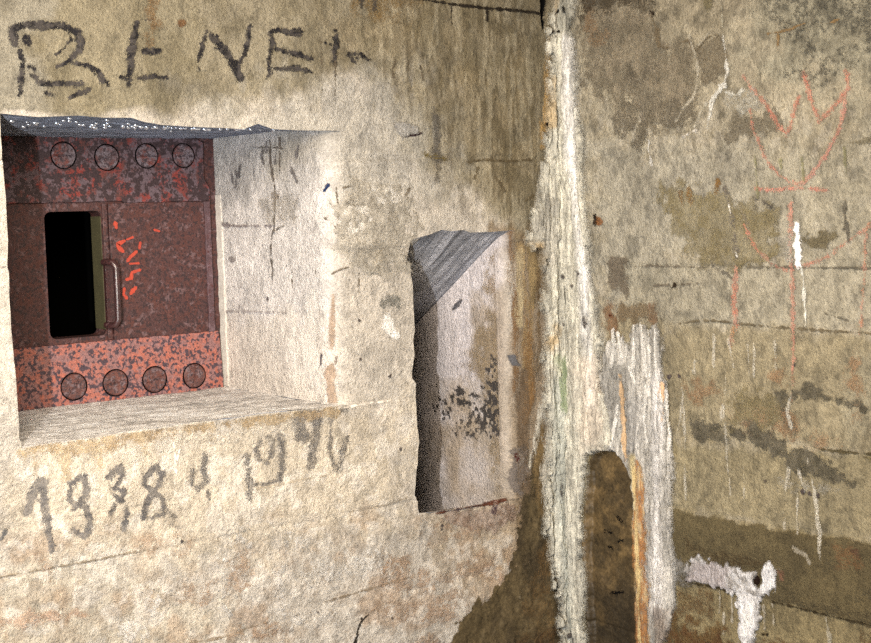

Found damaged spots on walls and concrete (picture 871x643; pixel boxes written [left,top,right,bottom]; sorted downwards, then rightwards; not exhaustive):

water stain [432,354,499,443]
corrosion [618,374,652,643]
water stain [451,0,871,643]
corrosion [663,583,736,643]